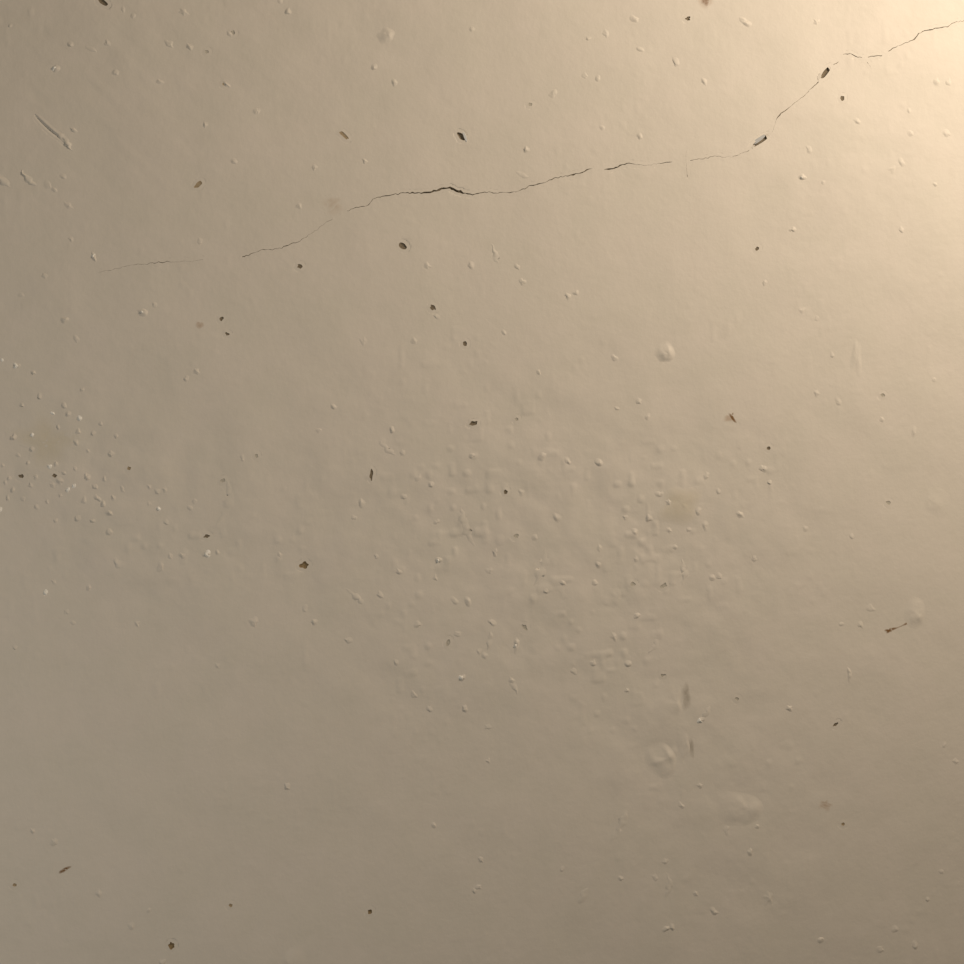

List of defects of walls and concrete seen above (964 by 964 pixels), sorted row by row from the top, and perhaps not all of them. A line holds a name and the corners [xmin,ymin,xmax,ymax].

crack [238,17,964,260]